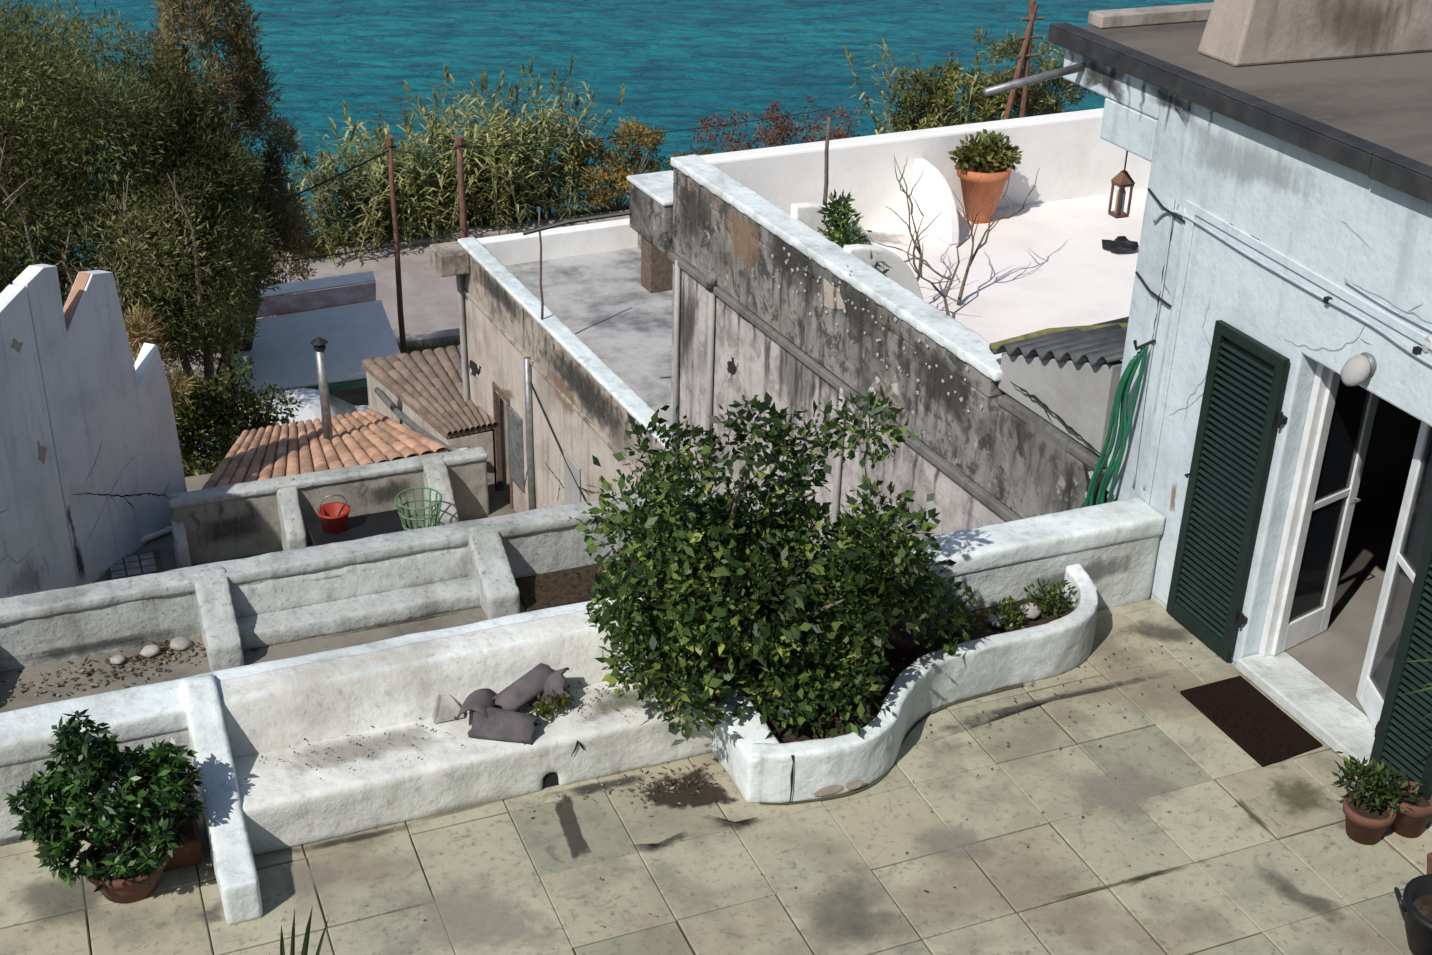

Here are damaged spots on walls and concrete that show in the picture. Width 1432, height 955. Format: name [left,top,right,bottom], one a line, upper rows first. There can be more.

damp [1084,60,1121,102]
damp [1142,84,1190,121]
damp [676,174,705,229]
damp [723,216,812,294]
damp [680,283,697,360]
damp [723,306,866,448]
damp [823,274,970,440]
crack [1287,278,1432,351]
damp [1000,413,1072,484]
crack [73,439,169,547]
damp [358,481,405,502]